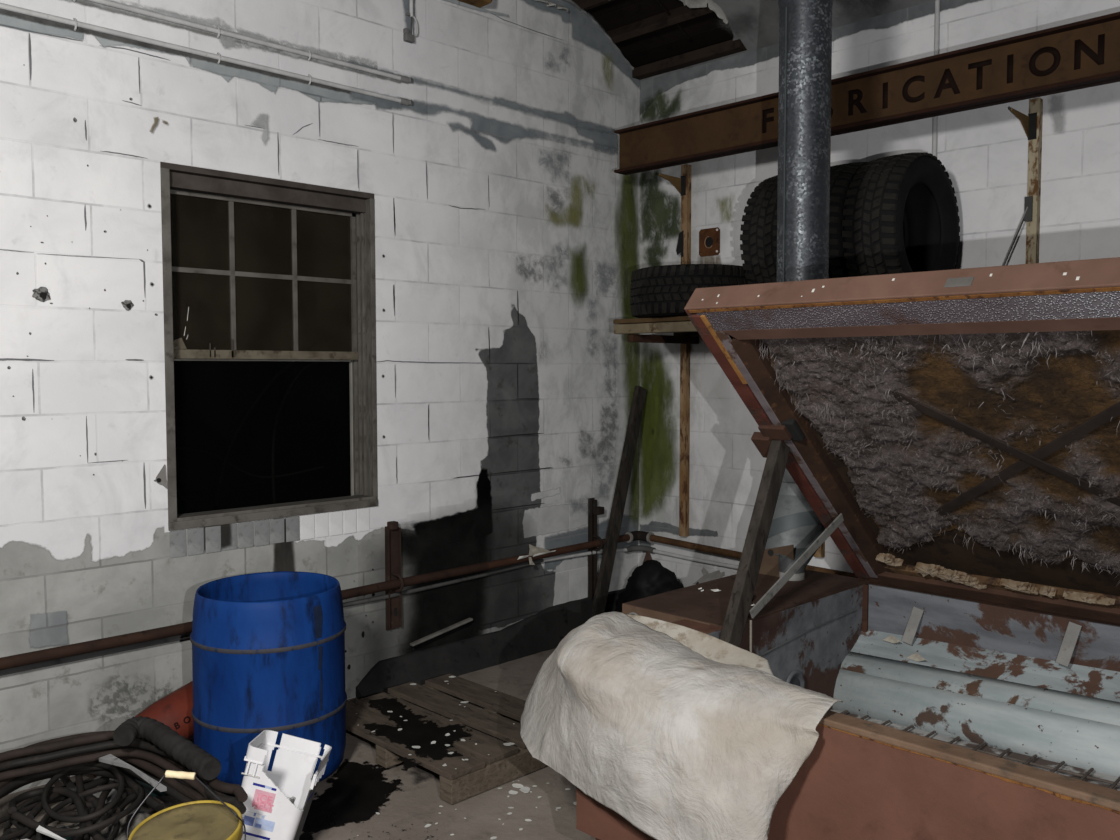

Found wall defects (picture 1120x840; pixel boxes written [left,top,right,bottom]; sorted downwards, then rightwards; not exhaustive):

peeling [403,0,415,34]
peeling [832,0,980,41]
peeling [524,0,779,115]
peeling [0,9,617,154]
damp [550,206,578,224]
damp [571,248,587,298]
damp [647,244,666,267]
spalling [32,287,53,304]
peeling [292,528,415,699]
peeling [0,520,275,753]
peeling [11,775,74,793]